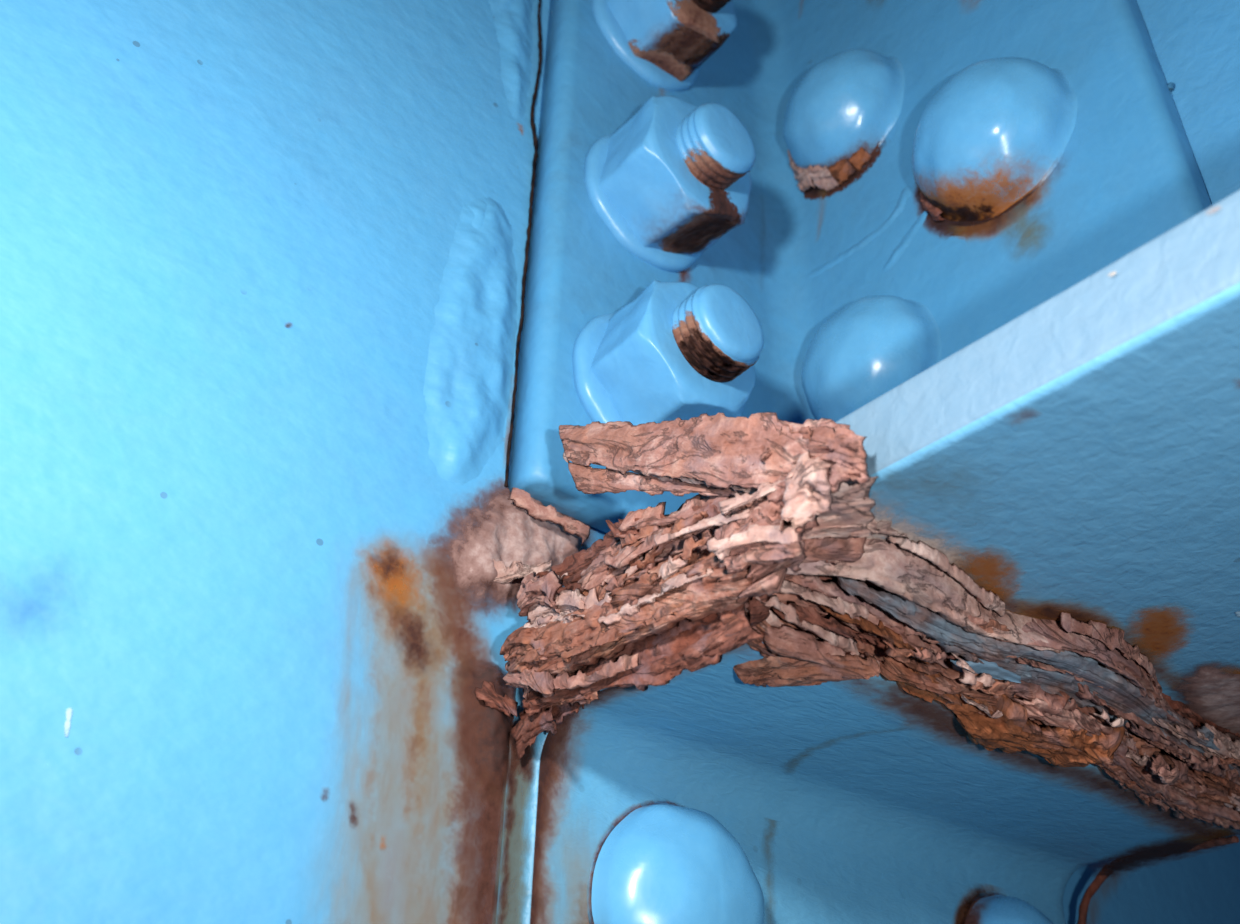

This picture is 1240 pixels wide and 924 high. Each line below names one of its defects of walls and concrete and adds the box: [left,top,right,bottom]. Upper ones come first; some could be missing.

corrosion [628,0,731,82]
crack [504,0,542,487]
corrosion [661,147,750,255]
corrosion [804,142,884,200]
corrosion [915,169,1041,246]
corrosion [672,312,759,383]
corrosion [370,412,1240,924]